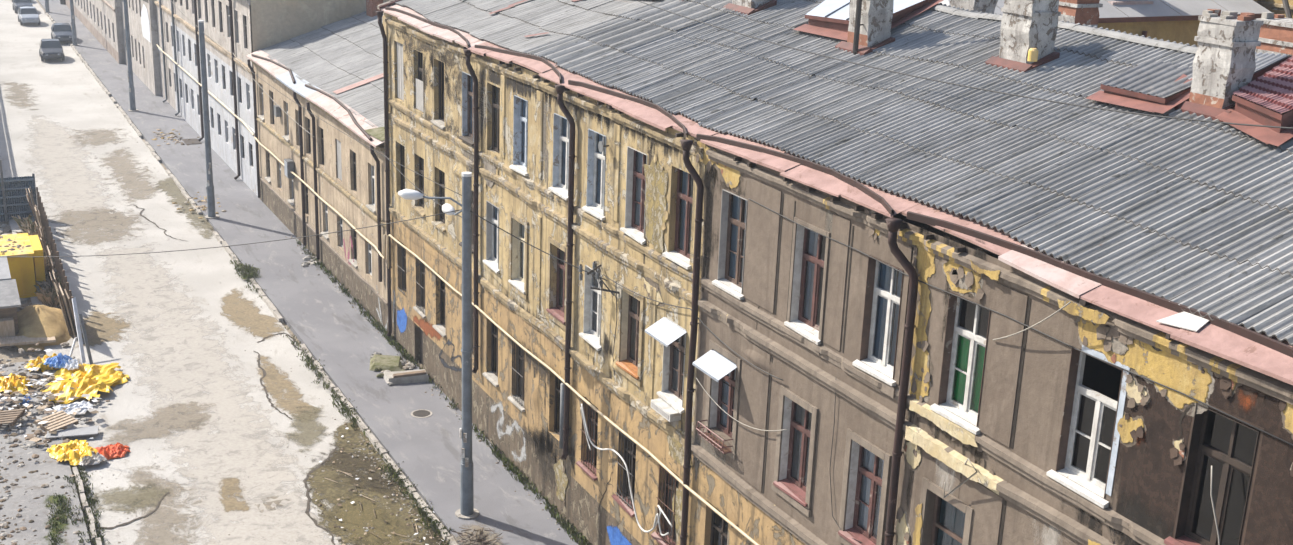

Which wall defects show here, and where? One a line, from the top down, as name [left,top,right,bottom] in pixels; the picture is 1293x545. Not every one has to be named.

flaking render [895,245,1001,545]
flaking render [1058,299,1243,447]
flaking render [1170,438,1186,466]
flaking render [1279,400,1293,440]